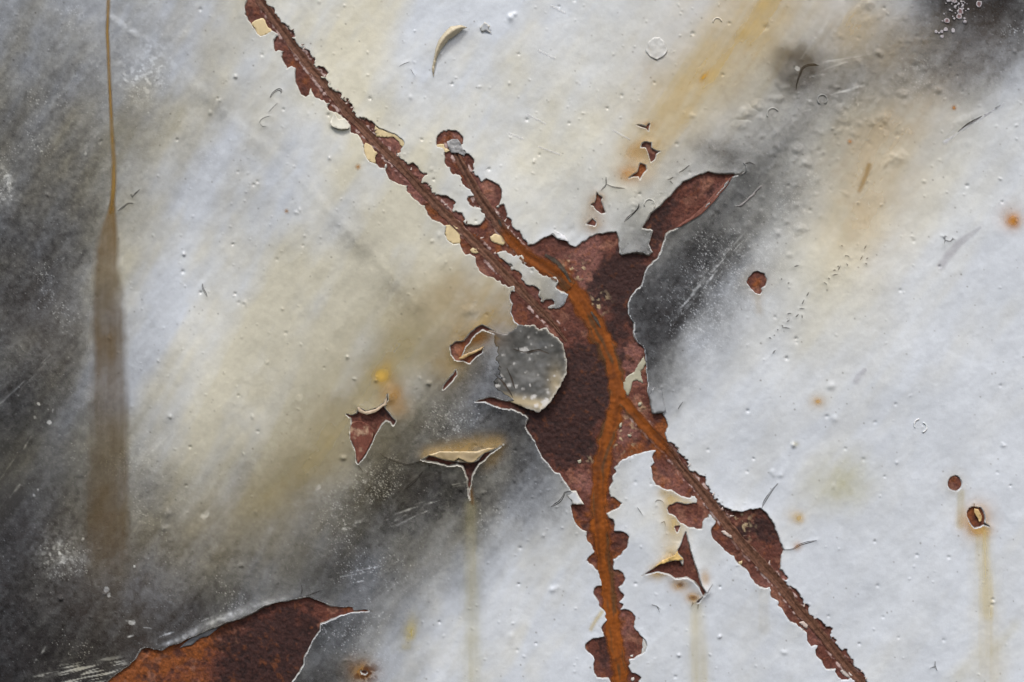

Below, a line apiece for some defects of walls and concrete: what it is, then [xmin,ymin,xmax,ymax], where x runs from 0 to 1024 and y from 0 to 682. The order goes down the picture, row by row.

water stain [95,0,121,380]
peeling [245,0,867,682]
peeling [108,586,368,682]